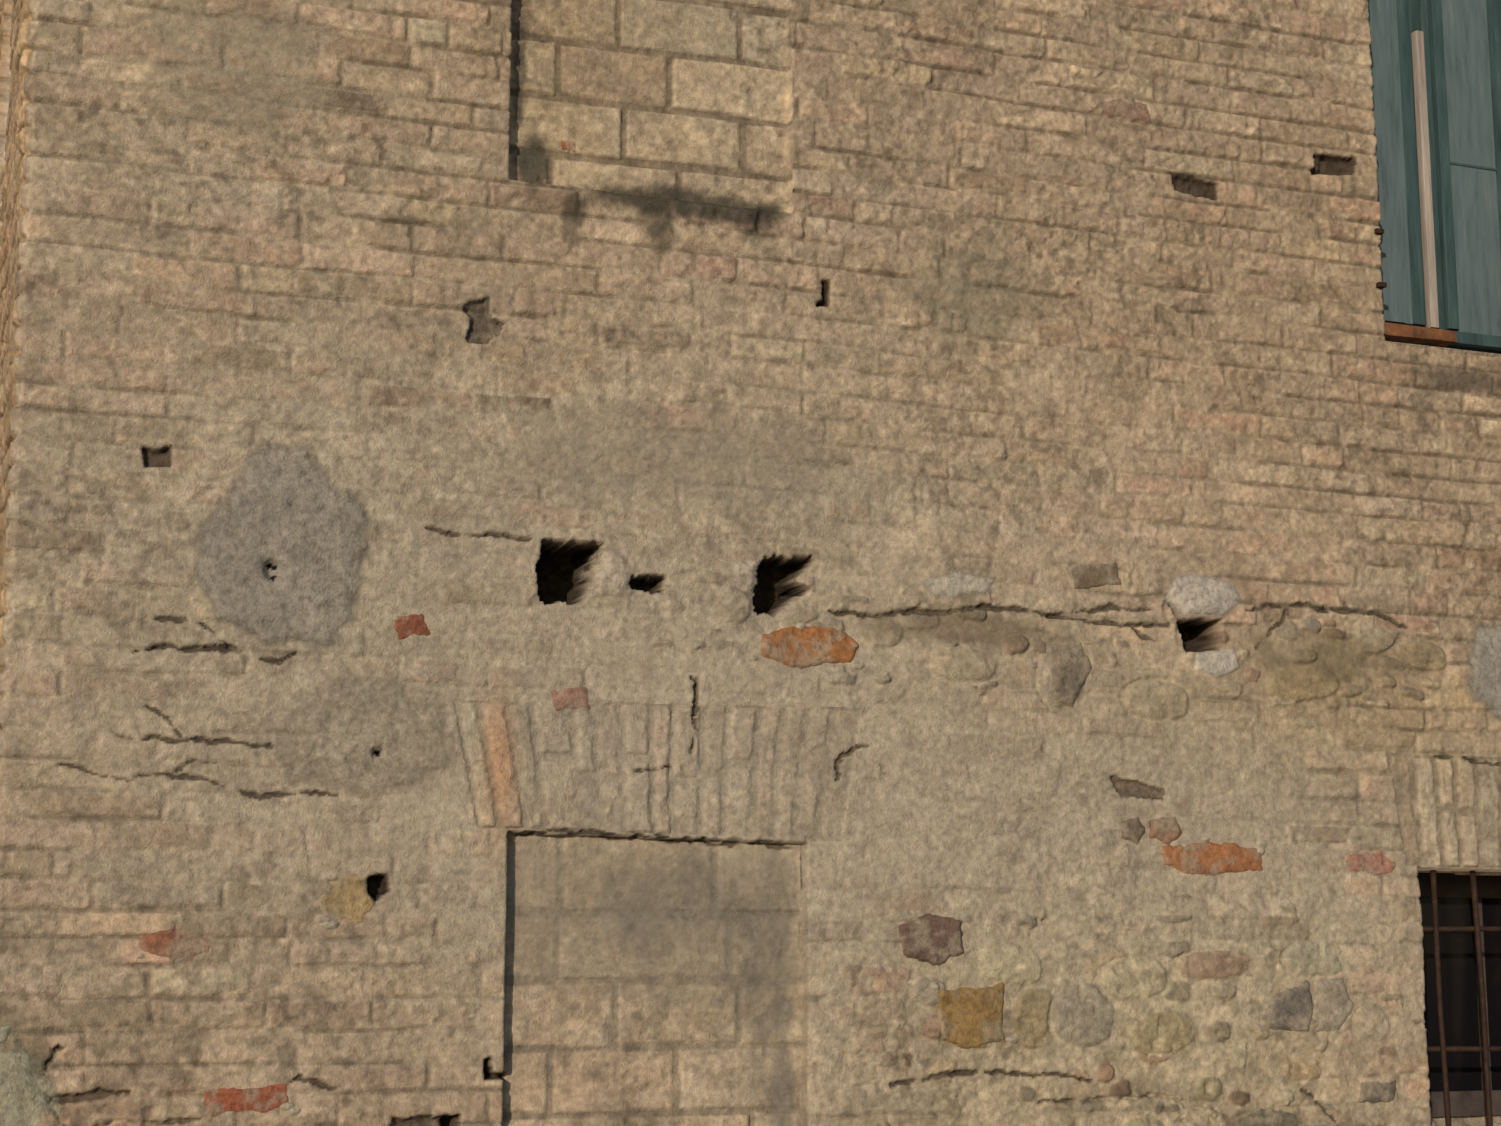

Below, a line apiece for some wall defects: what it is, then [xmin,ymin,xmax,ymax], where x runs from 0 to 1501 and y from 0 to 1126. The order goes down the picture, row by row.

water stain [516,139,547,182]
water stain [599,186,781,239]
spalling [464,297,504,344]
spalling [535,543,597,605]
crack [134,616,296,665]
spalling [750,558,865,671]
crack [828,603,1169,641]
crack [1245,602,1407,649]
crack [634,676,700,772]
crack [60,705,338,800]
crack [889,1069,1100,1104]
crack [1301,1088,1335,1122]